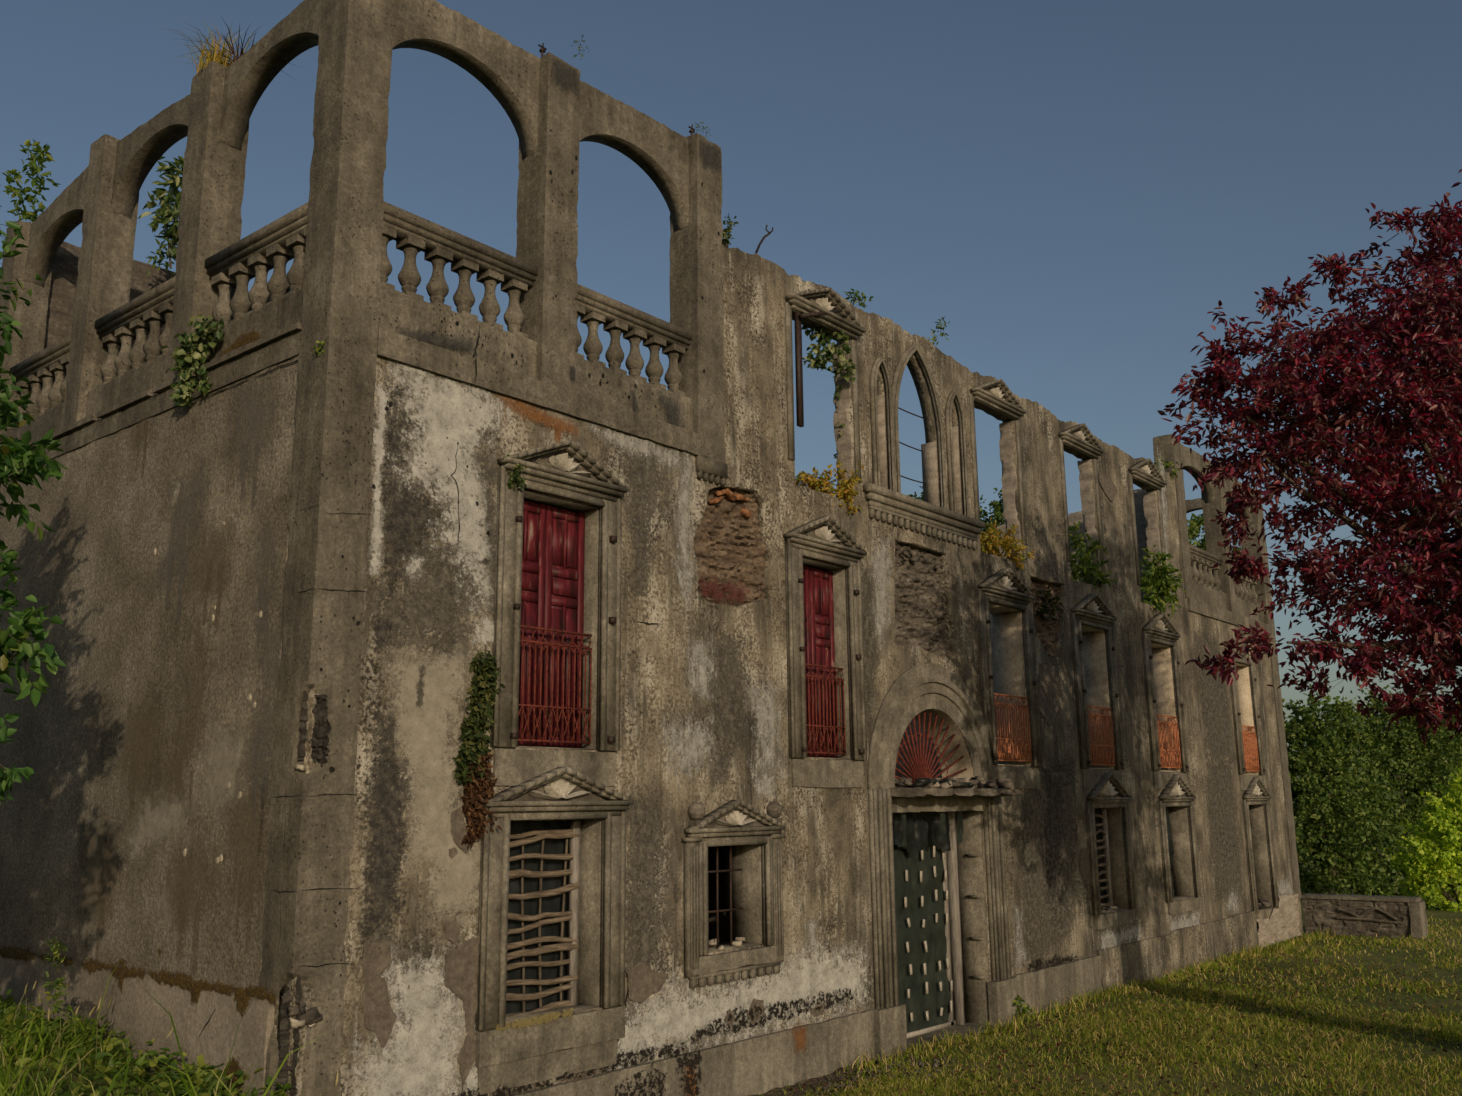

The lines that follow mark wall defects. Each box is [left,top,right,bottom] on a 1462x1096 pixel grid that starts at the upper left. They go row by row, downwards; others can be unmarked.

leakage [364,365,498,708]
spalling [708,488,752,520]
leakage [118,468,282,973]
leakage [350,688,412,949]
peeling [361,941,396,1048]
peeling [444,920,479,1095]